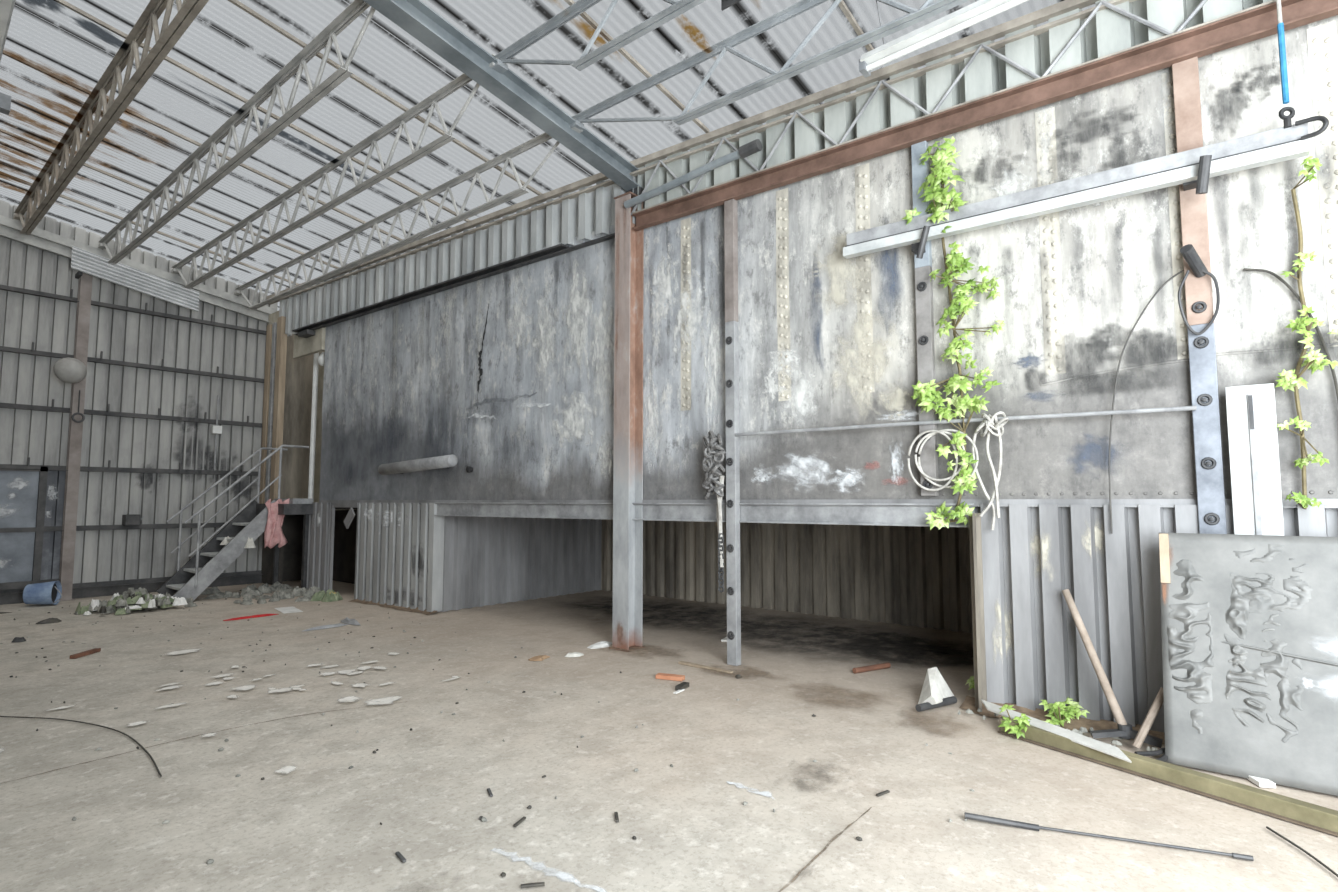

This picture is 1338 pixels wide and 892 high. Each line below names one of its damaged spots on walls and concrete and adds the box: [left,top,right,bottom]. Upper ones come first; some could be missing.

water stain [1202,73,1280,128]
water stain [1056,115,1139,168]
water stain [975,160,1017,197]
crack [477,304,489,408]
water stain [508,273,614,473]
peeling [757,456,858,492]
crack [779,808,871,892]